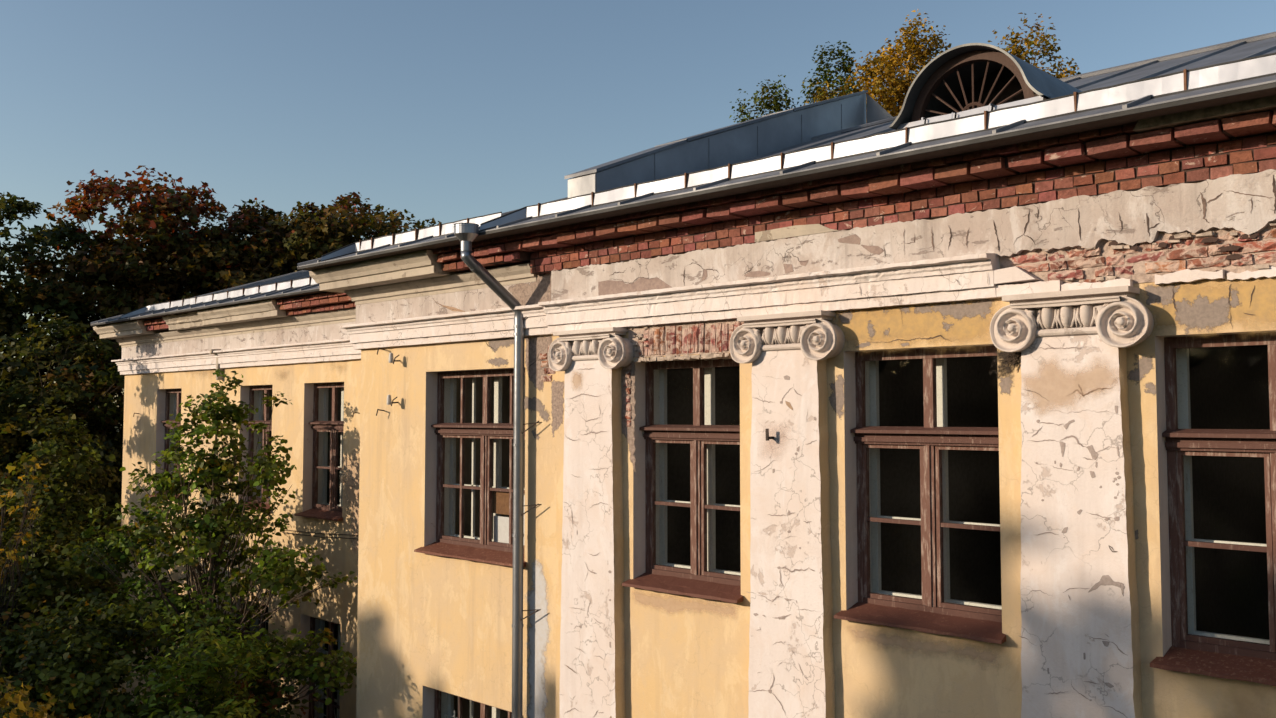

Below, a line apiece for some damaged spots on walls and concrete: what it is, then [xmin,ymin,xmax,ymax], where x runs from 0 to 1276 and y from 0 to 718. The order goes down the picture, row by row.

crack [881,210,1039,285]
flaking render [1000,221,1276,334]
crack [1119,213,1159,236]
crack [1200,175,1276,223]
flaking render [487,335,564,440]
crack [565,368,606,441]
flaking render [621,319,744,471]
crack [1027,384,1120,478]
peeling [1127,355,1157,395]
crack [559,468,608,716]
crack [748,375,816,712]
crack [1021,509,1125,599]